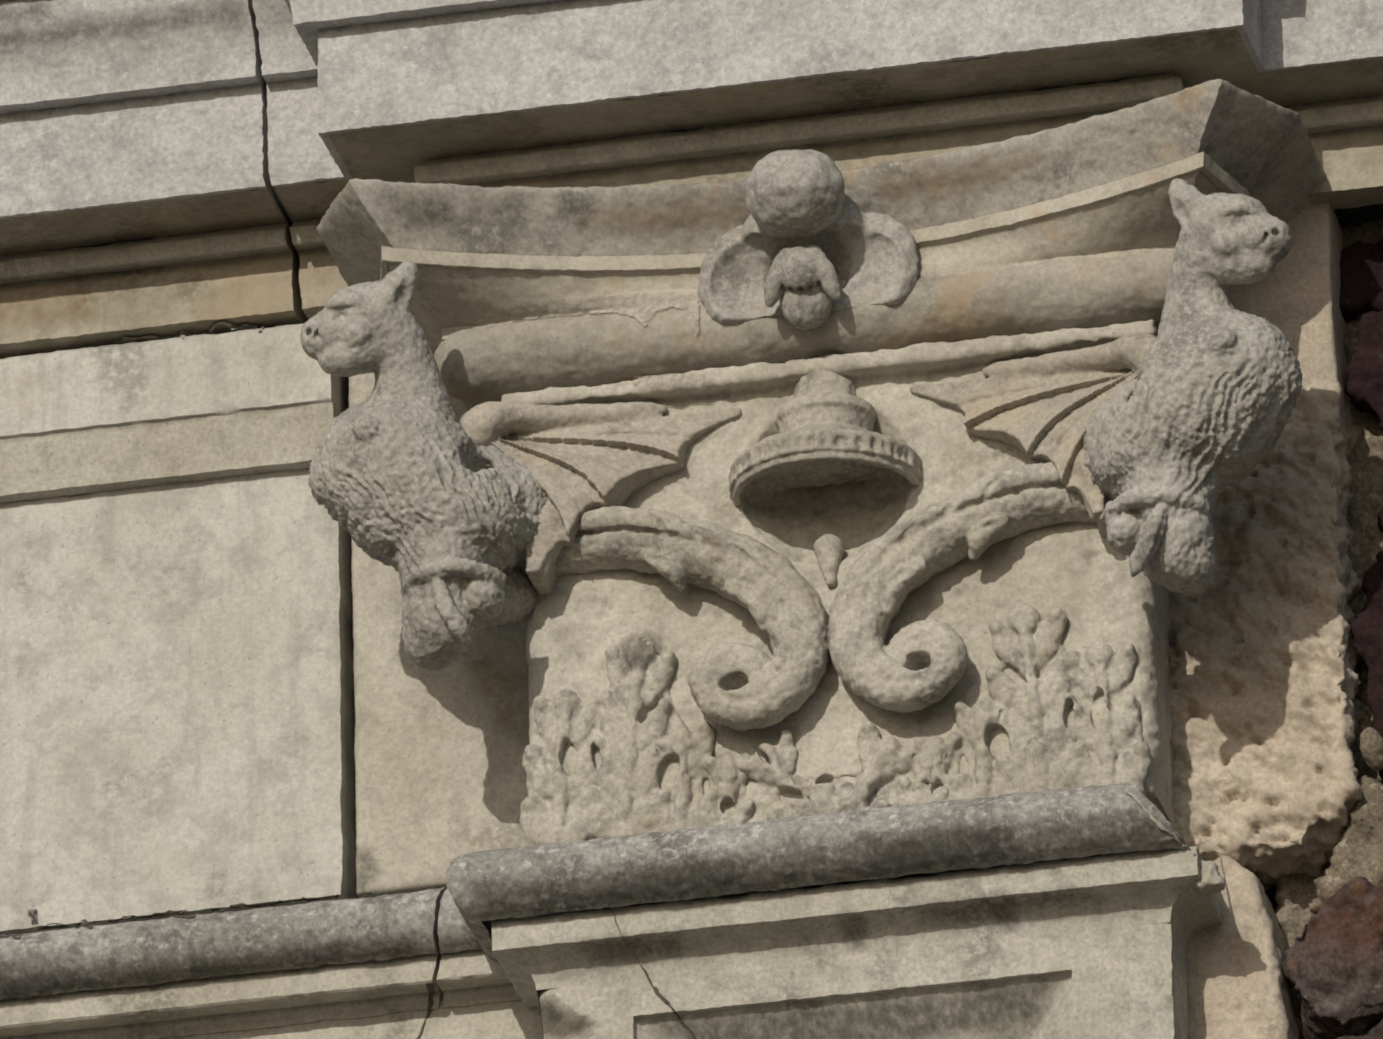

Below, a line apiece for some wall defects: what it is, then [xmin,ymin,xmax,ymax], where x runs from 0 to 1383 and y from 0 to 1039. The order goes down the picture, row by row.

crack [417,983,436,1039]
crack [608,903,697,1039]